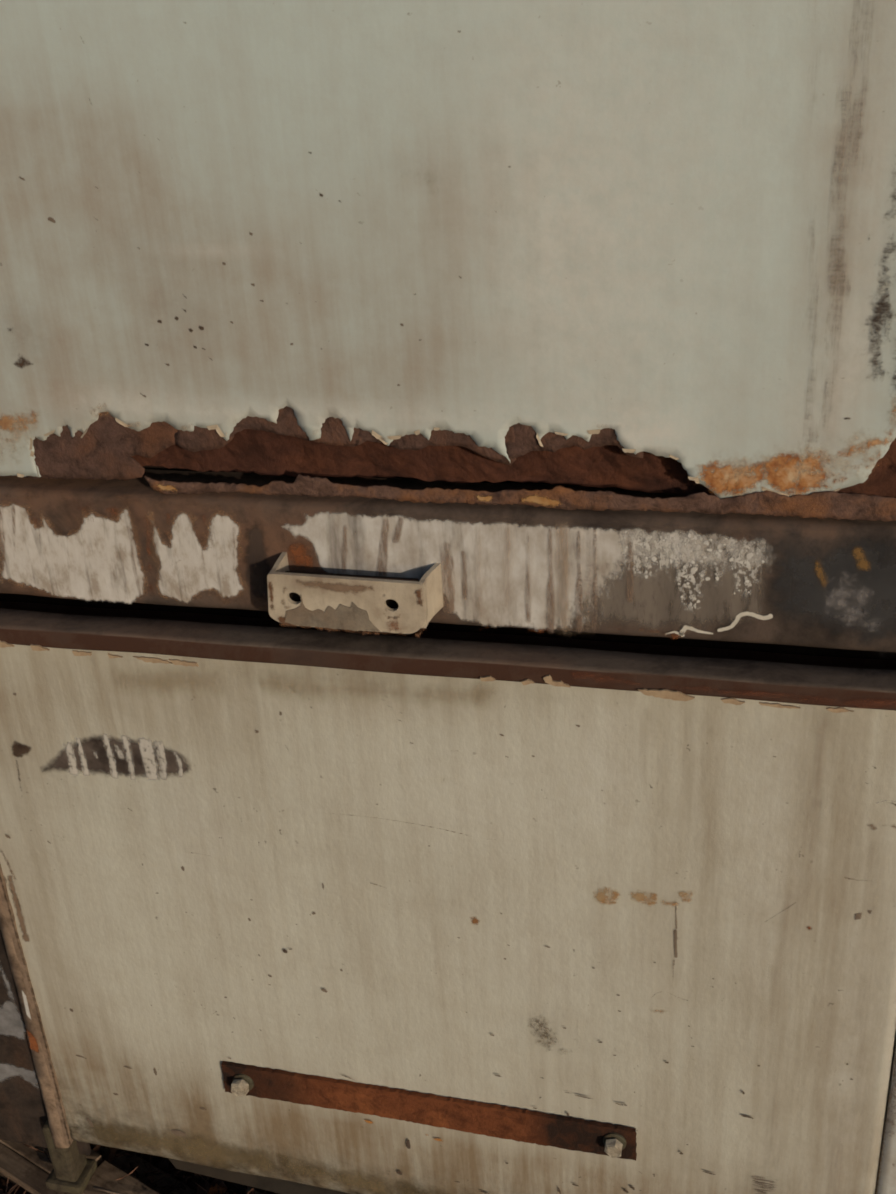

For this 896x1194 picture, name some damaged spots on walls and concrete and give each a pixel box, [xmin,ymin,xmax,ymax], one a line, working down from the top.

damp [871,243,896,380]
peeling [371,428,440,445]
rust [0,406,896,522]
peeling [0,502,246,604]
rust [245,525,398,635]
rust [377,518,402,576]
rust [443,551,467,613]
peeling [282,512,767,631]
rust [853,548,869,570]
rust [594,888,692,906]